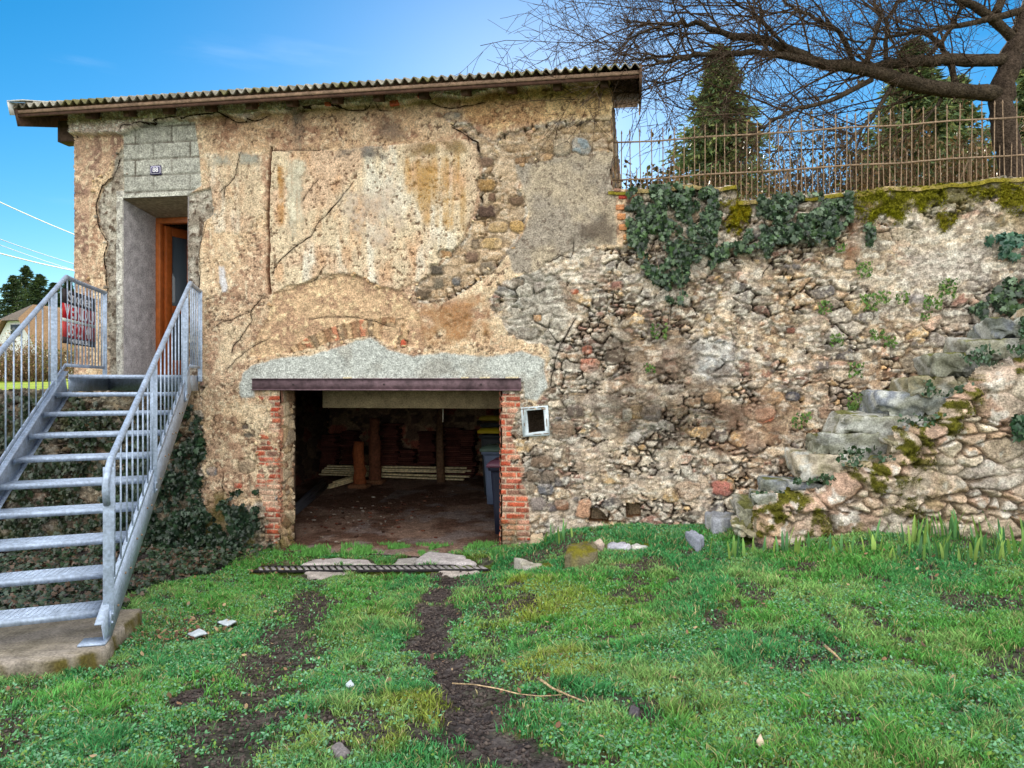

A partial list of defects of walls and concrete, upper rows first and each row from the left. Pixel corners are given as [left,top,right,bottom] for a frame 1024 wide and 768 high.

crack [118,111,267,196]
crack [432,102,484,153]
crack [95,160,120,302]
crack [220,145,353,370]
peeling [249,118,613,361]